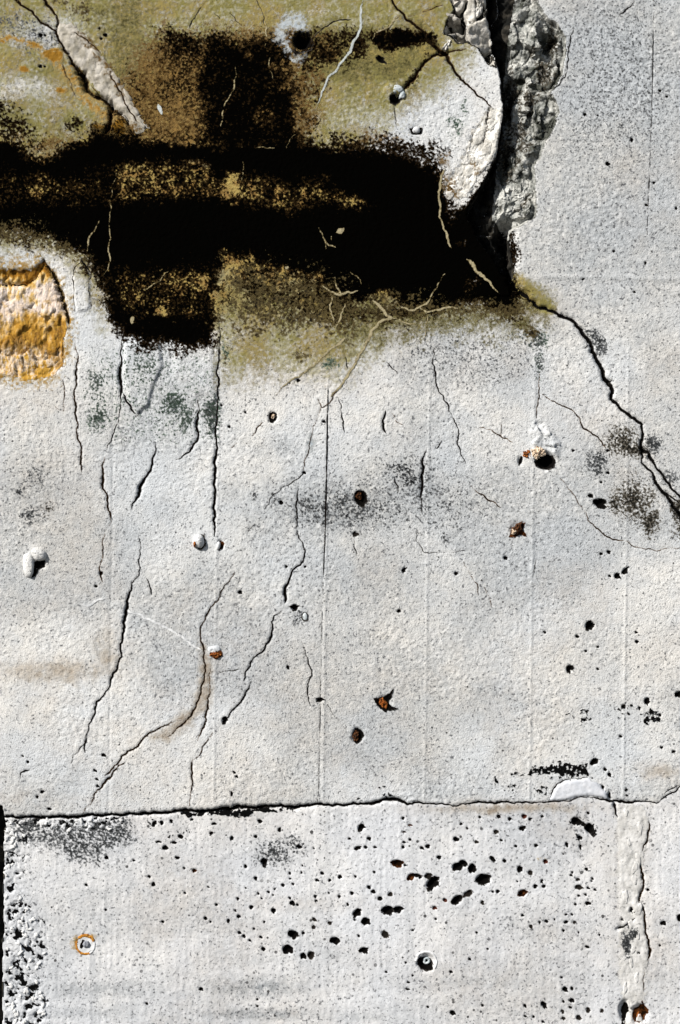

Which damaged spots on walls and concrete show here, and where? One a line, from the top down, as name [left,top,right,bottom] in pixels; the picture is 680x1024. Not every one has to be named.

rust [0,373,60,389]
rust [0,253,74,365]
leakage [0,0,677,446]
spalling [441,0,567,282]
crack [0,178,680,990]
rust [73,934,95,955]